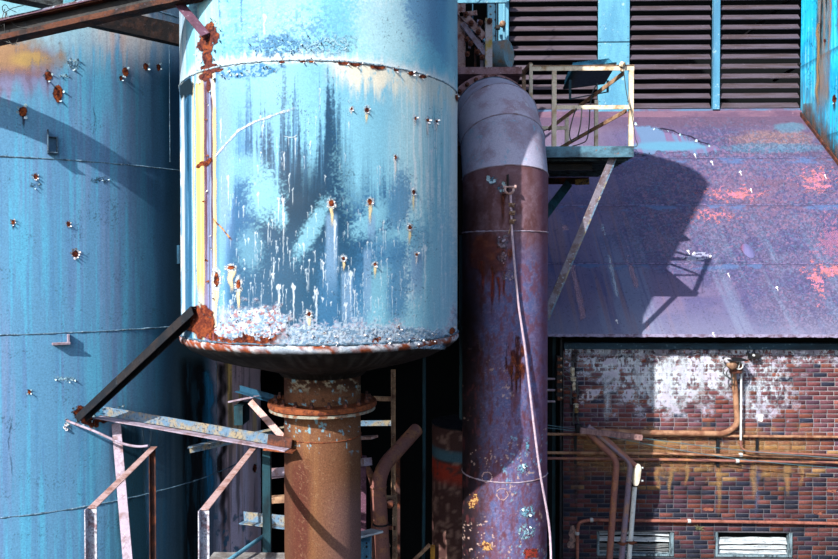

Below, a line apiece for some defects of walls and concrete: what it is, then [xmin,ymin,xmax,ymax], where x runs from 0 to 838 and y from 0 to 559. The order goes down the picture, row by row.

corrosion [0,42,65,102]
corrosion [338,60,428,80]
corrosion [815,0,838,109]
corrosion [16,103,28,125]
corrosion [803,104,838,159]
corrosion [186,18,289,347]
corrosion [469,233,512,305]
corrosion [505,336,525,392]
leakage [565,349,838,419]